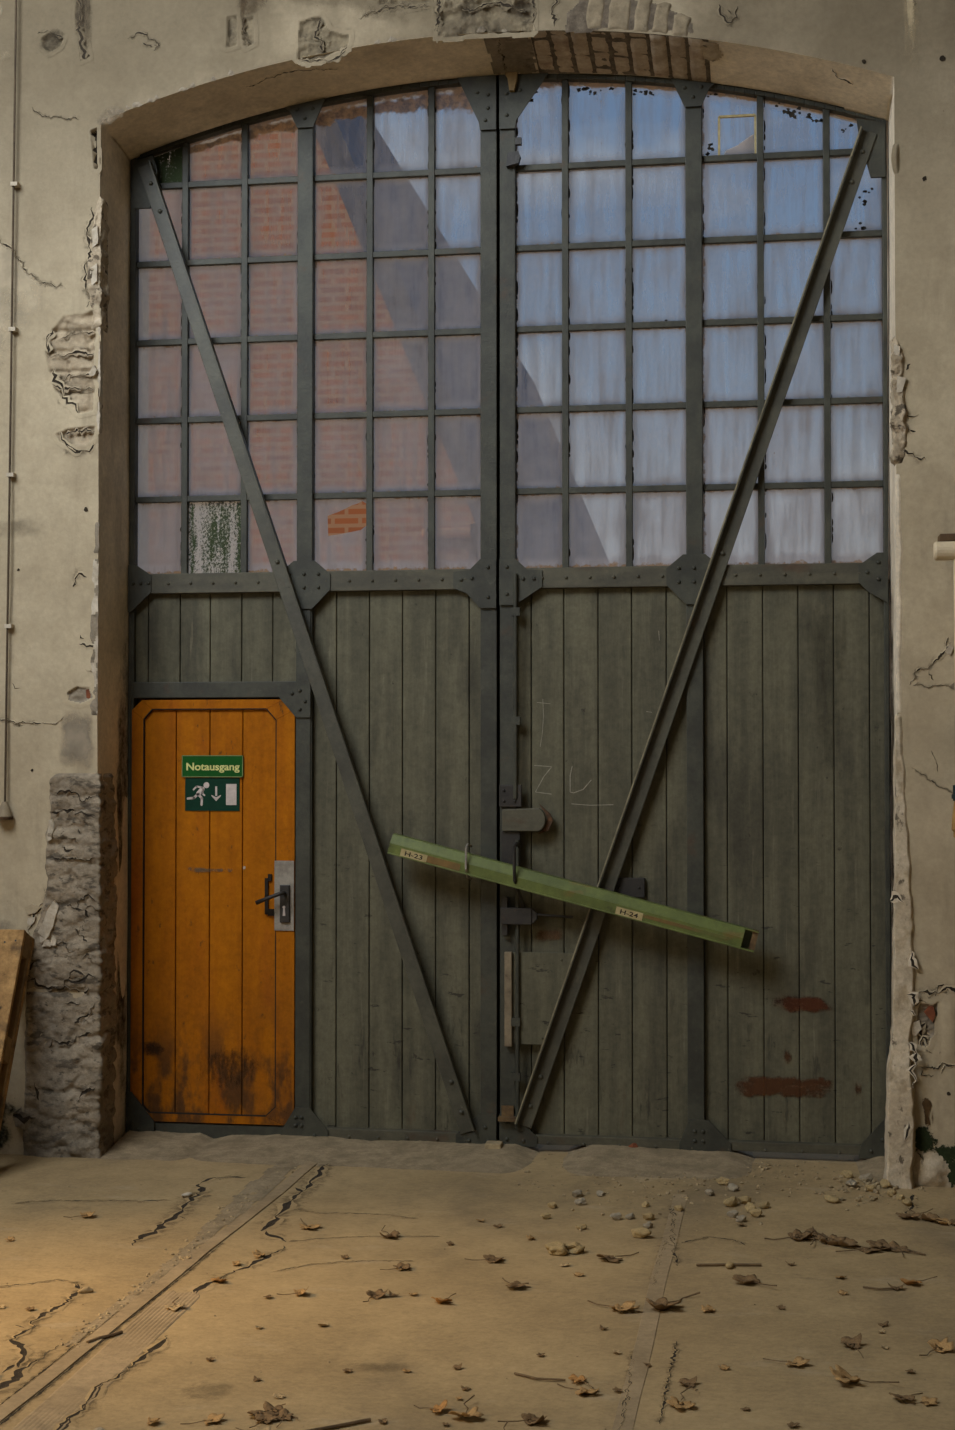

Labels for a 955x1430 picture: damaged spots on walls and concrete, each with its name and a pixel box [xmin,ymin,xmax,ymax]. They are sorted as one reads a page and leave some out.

spalling [36,0,93,65]
flaking render [292,0,711,82]
flaking render [0,238,62,288]
flaking render [41,197,110,457]
spalling [889,336,955,713]
flaking render [24,888,59,947]
spalling [911,983,944,1054]
crack [17,1175,246,1246]
crack [187,1164,441,1294]
crack [0,1279,85,1392]
crack [52,1335,171,1430]